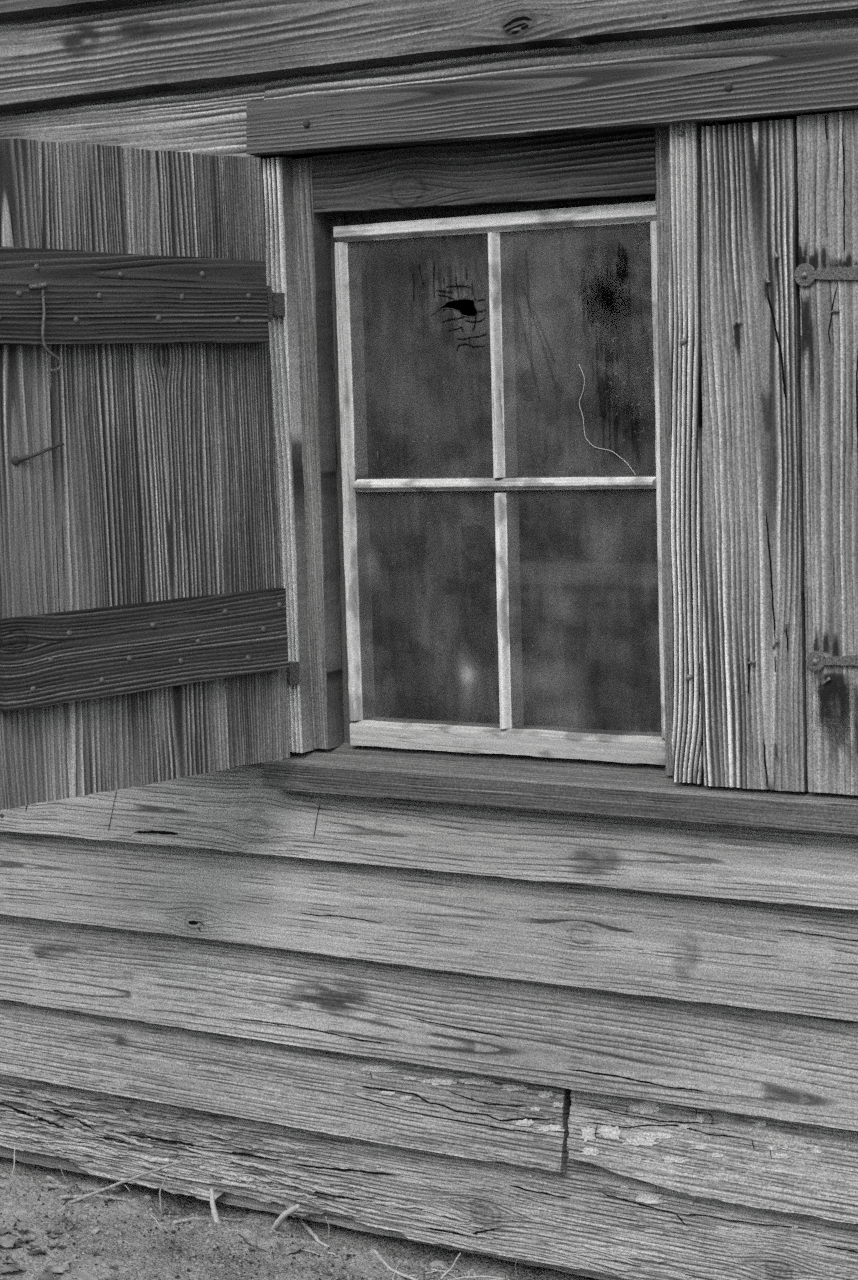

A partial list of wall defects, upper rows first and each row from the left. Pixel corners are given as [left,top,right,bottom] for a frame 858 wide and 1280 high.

crack [579,364,636,475]
crack [230,1017,772,1158]
crack [1,1104,393,1206]
crack [426,1227,499,1236]